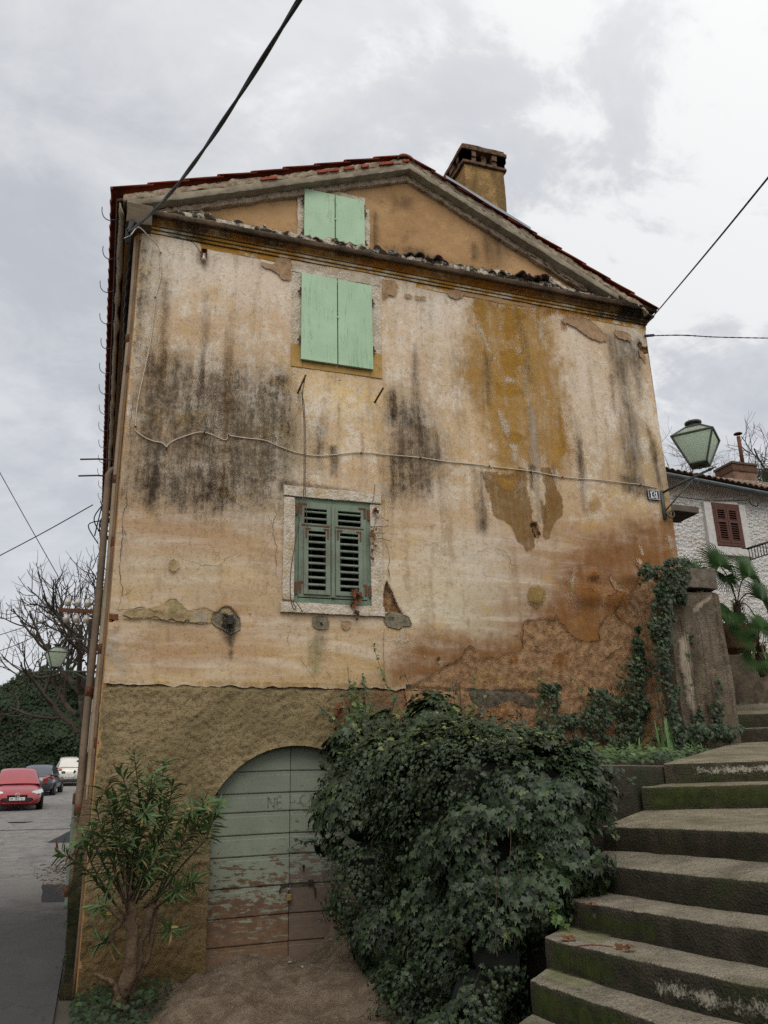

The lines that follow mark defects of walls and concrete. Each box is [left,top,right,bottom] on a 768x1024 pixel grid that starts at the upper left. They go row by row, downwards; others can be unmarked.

peeling [561,317,648,362]
water stain [122,338,290,519]
water stain [390,389,446,497]
spalling [109,599,238,624]
spalling [383,582,412,629]
spalling [405,574,668,756]